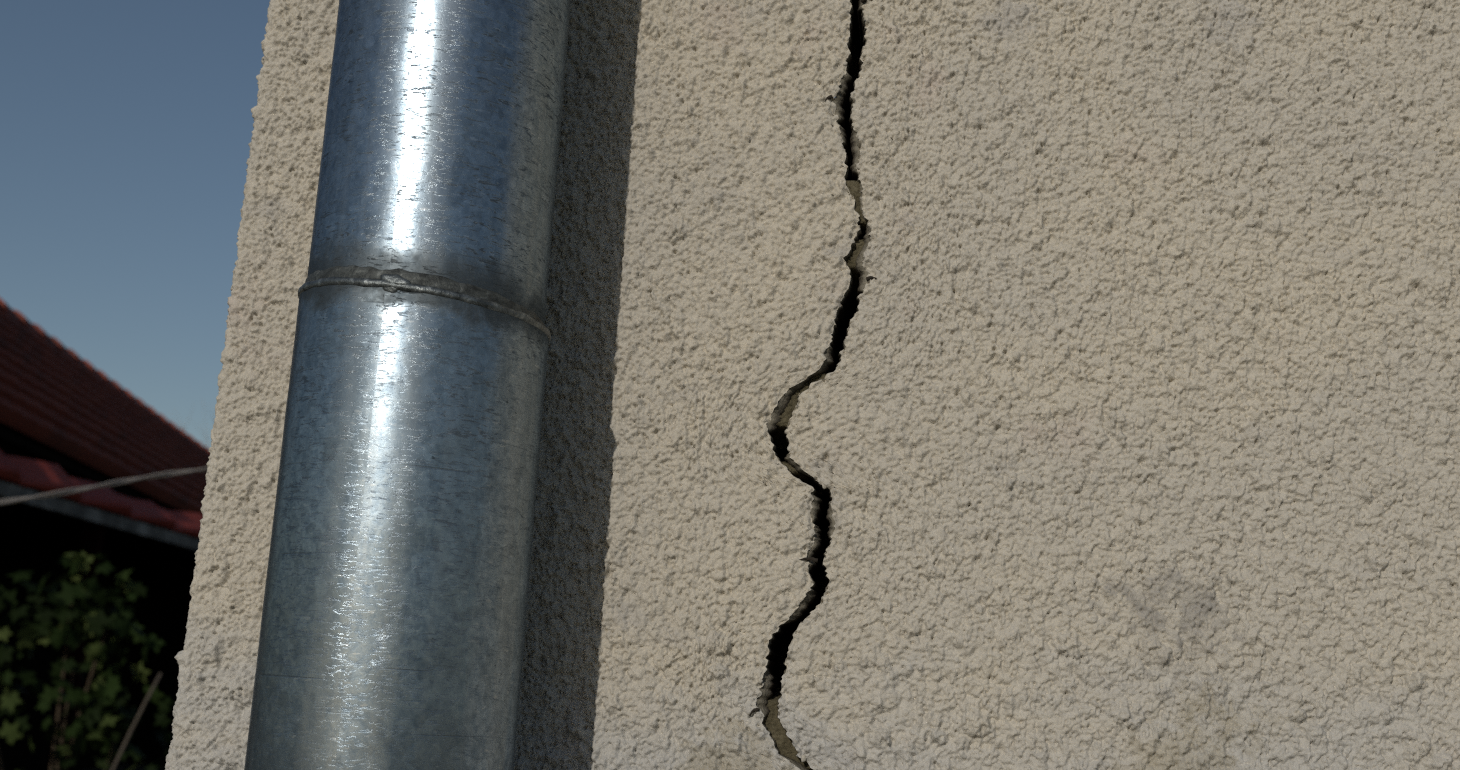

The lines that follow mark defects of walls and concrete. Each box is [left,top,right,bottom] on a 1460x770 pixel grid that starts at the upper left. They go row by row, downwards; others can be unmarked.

crack [749,0,877,770]